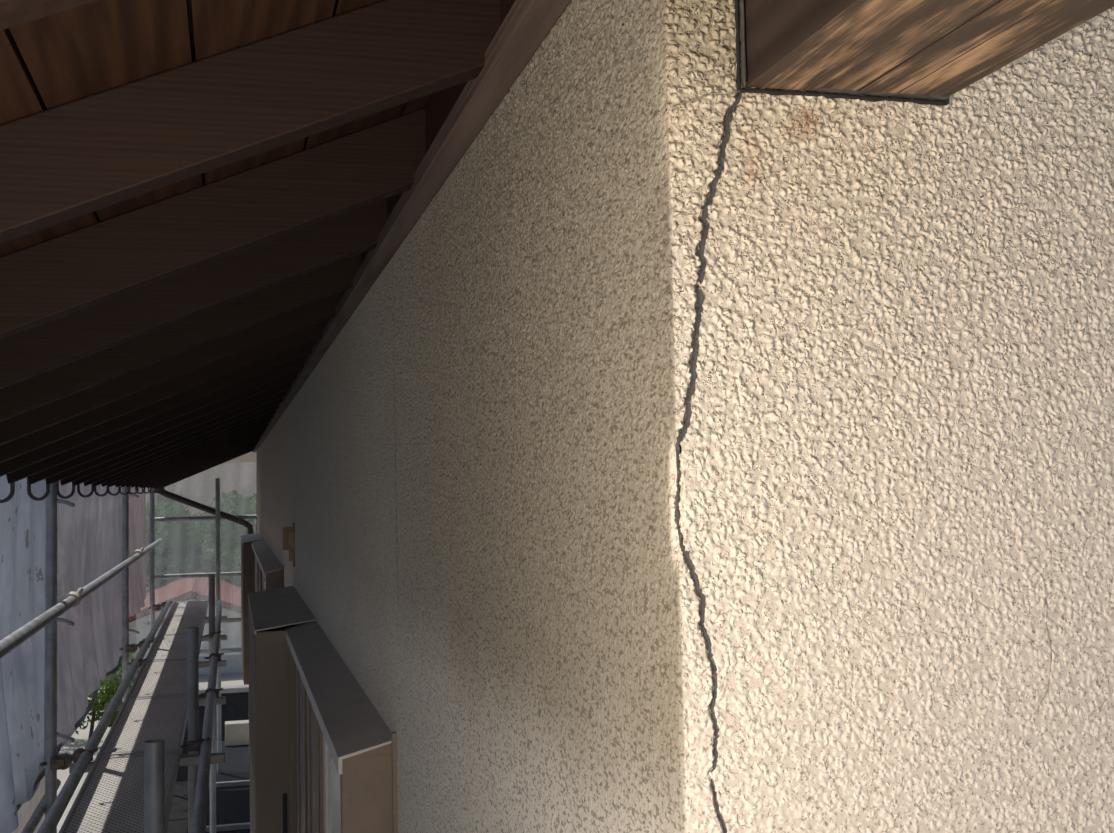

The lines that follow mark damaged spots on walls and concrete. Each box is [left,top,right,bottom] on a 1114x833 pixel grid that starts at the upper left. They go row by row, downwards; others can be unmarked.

crack [671,91,742,833]